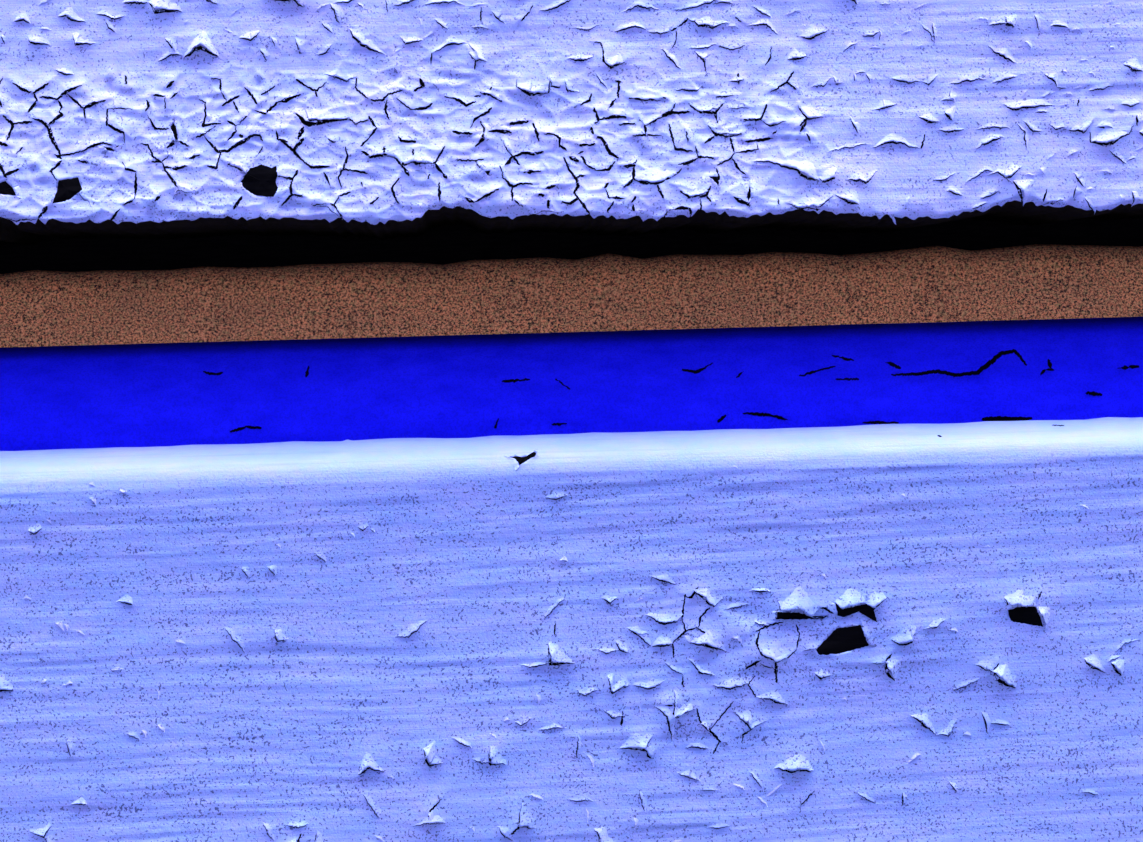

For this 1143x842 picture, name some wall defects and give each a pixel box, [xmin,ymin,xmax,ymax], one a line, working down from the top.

peeling [57,0,183,46]
peeling [566,0,753,126]
peeling [291,106,351,133]
crack [0,17,818,221]
peeling [918,45,1143,164]
crack [1069,99,1133,145]
peeling [0,175,37,222]
peeling [48,172,93,209]
peeling [230,158,284,203]
peeling [690,585,901,681]
peeling [1001,590,1051,631]
crack [665,586,800,754]